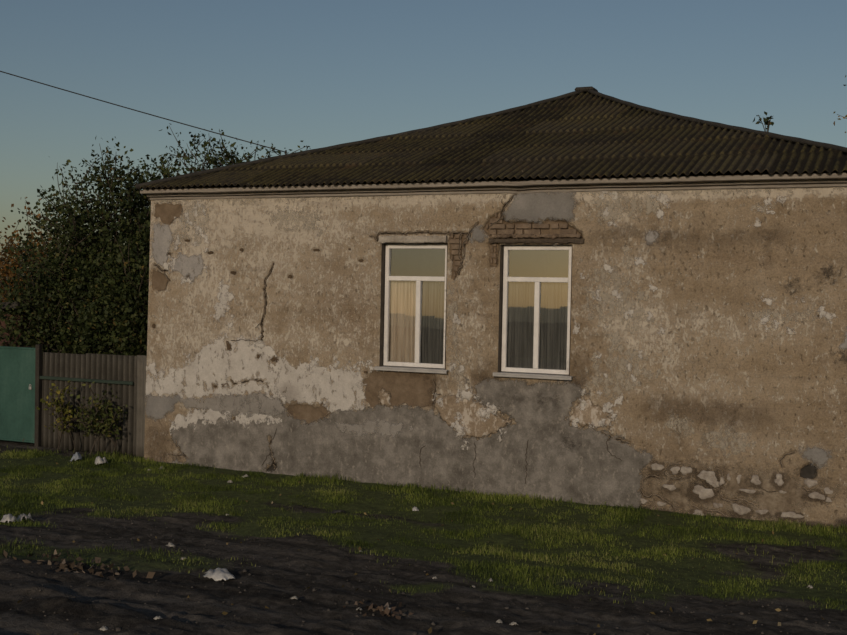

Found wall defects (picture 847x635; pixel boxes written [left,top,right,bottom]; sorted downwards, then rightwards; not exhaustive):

spalling [152,198,262,291]
flaking render [483,213,583,267]
crack [231,263,274,341]
peeling [146,271,441,437]
flaking render [444,232,470,396]